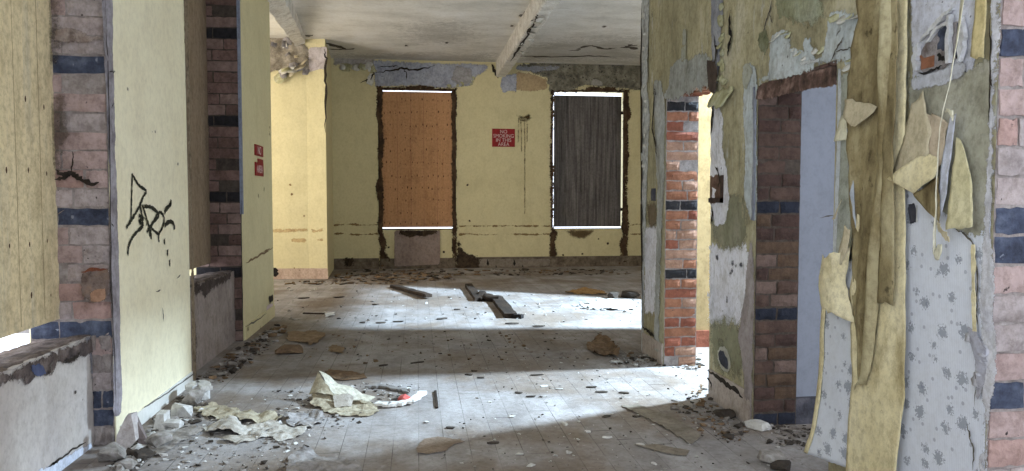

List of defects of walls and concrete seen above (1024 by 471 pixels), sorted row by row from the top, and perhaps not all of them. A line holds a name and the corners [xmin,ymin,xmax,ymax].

flaking render [0,0,122,471]
crack [55,3,116,386]
crack [241,203,272,327]
flaking render [270,37,488,268]
crack [361,65,435,83]
crack [492,3,657,339]
flaking render [479,0,858,426]
crack [707,370,743,398]
flaking render [911,0,975,78]
flaking render [964,0,1024,471]